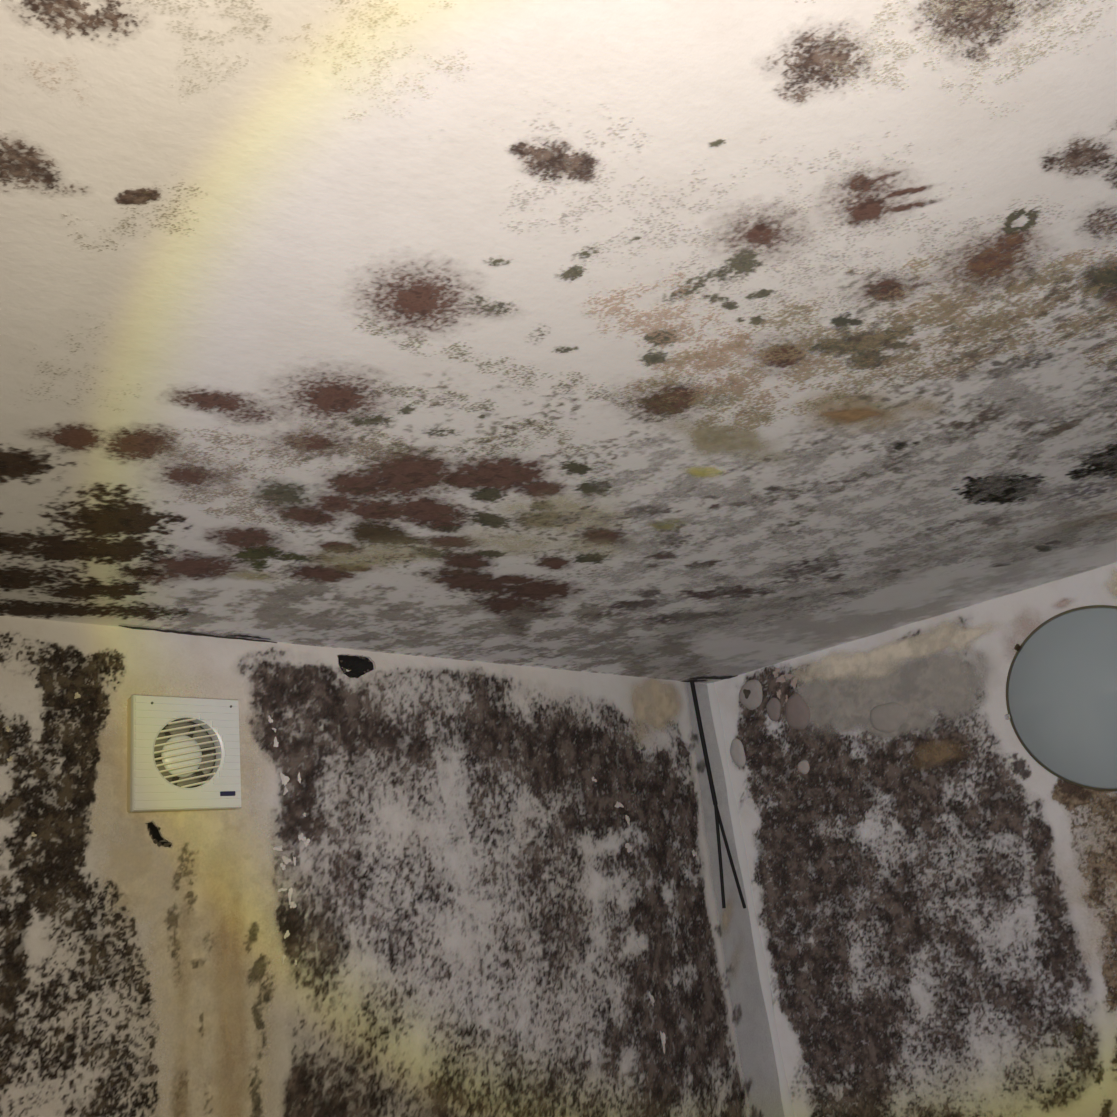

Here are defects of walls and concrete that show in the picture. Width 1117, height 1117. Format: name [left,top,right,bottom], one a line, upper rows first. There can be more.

water stain [20,0,138,40]
water stain [774,0,1101,102]
water stain [0,138,85,192]
water stain [510,142,597,183]
water stain [1043,139,1117,187]
water stain [115,184,197,237]
water stain [829,172,935,225]
water stain [0,208,1117,683]
spalling [337,654,376,678]
water stain [0,642,751,1117]
water stain [736,619,1117,1117]